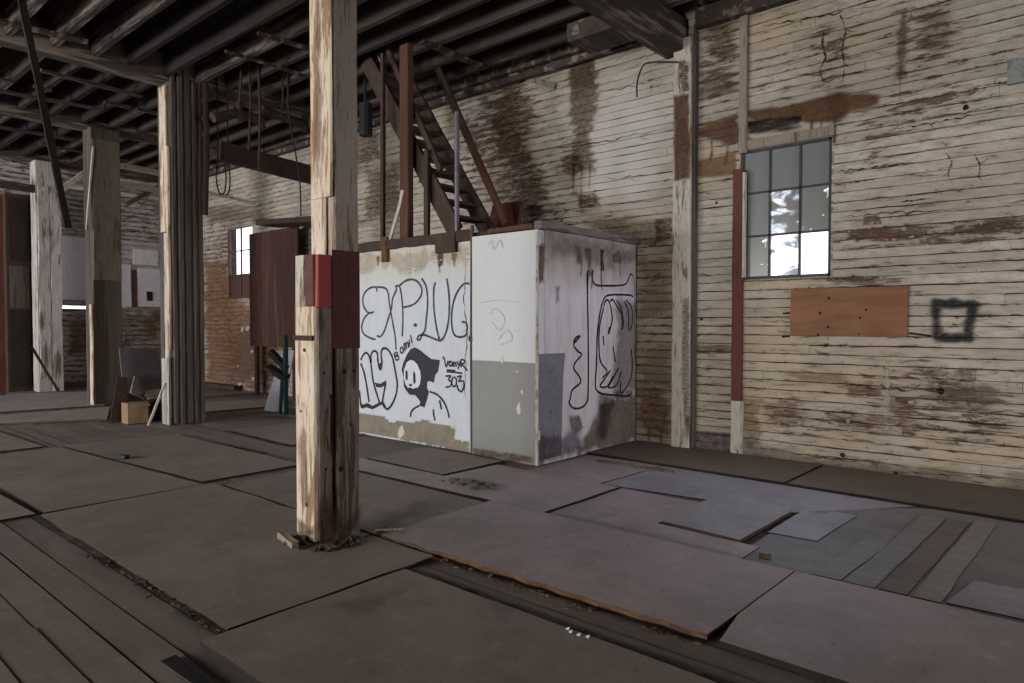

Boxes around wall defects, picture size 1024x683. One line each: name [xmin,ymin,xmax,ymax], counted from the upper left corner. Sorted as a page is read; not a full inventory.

crack [765,3,890,90]
damp [562,54,598,189]
flaking render [359,414,469,452]